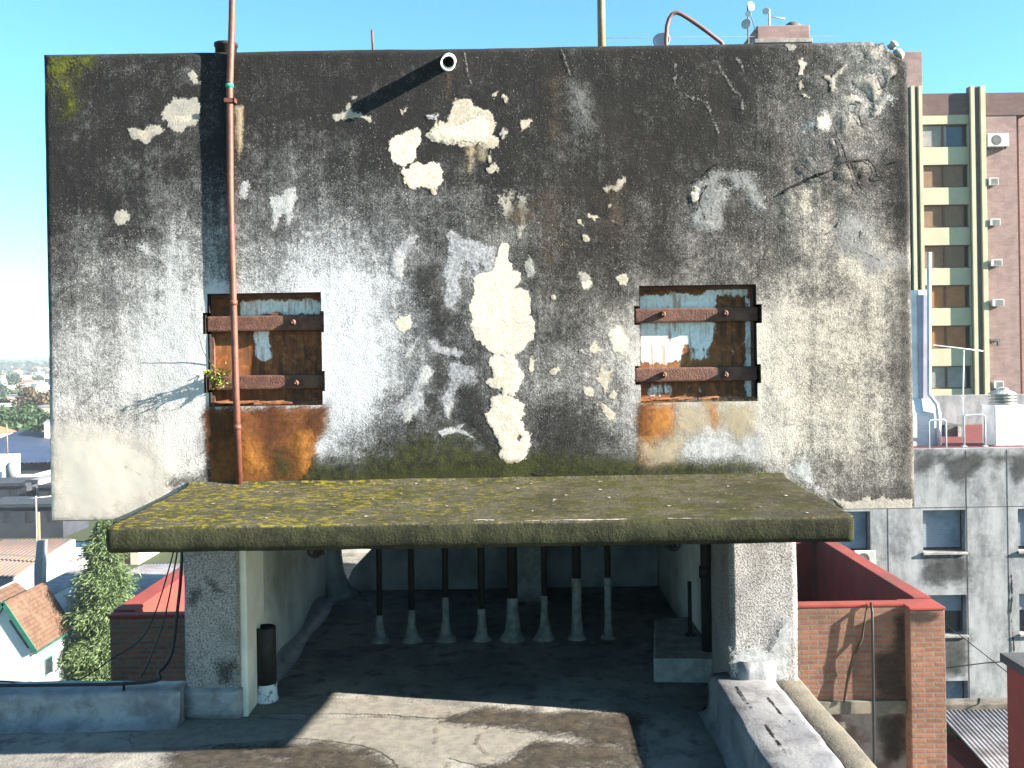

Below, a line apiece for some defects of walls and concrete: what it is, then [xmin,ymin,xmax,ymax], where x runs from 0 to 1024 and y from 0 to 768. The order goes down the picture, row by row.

spalling [786,44,810,98]
peeling [127,70,201,144]
peeling [332,96,372,122]
peeling [388,98,508,195]
crack [782,131,900,194]
peeling [270,187,320,237]
spalling [682,170,766,231]
peeling [388,190,536,463]
corrosion [202,405,329,482]
corrosion [637,402,755,469]
efflorescence [673,426,766,469]
water stain [915,452,1024,484]